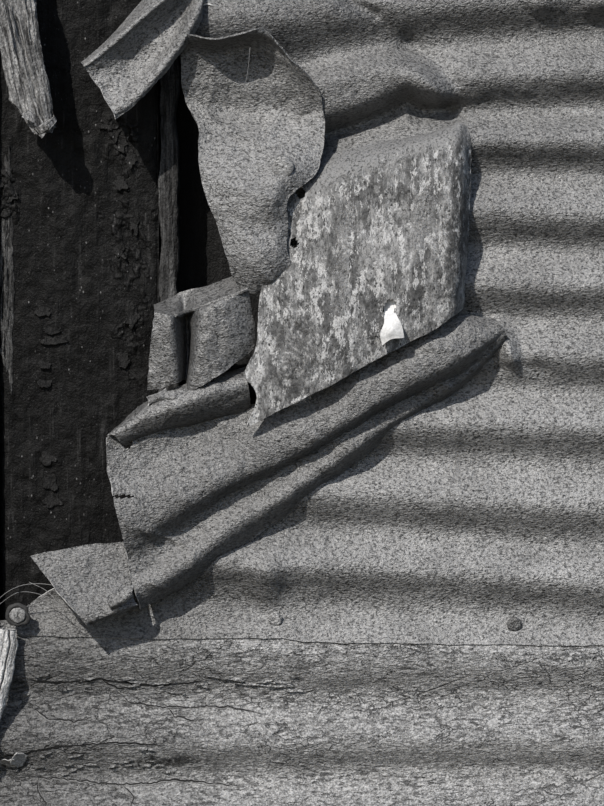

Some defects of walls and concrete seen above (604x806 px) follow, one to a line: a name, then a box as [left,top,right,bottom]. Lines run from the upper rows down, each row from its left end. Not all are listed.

peeling [97,111,159,384]
peeling [194,675,304,692]
peeling [61,754,97,776]
peeling [109,747,170,773]